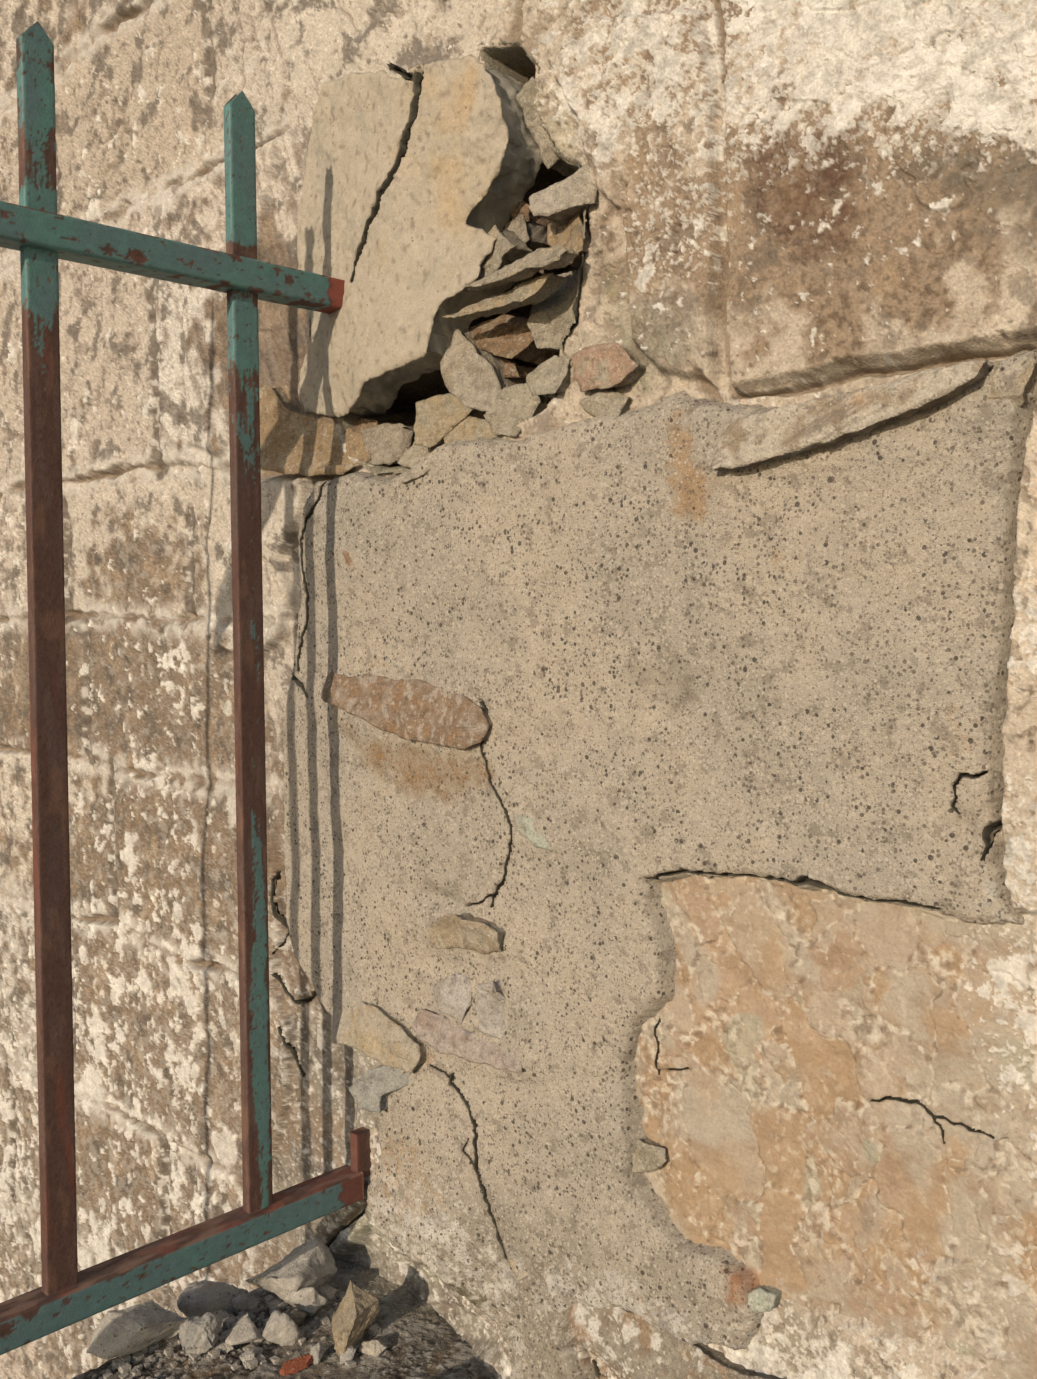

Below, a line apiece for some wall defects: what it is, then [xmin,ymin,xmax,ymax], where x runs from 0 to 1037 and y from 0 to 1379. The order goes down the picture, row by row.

spalling [477,39,540,88]
crack [350,61,424,283]
spalling [524,105,580,200]
spalling [469,304,532,327]
spalling [504,205,590,356]
spalling [341,370,450,435]
crack [292,480,330,698]
crack [467,699,513,908]
crack [647,870,941,910]
crack [430,1065,508,1261]
spalling [634,869,1037,1379]
crack [869,1096,995,1144]